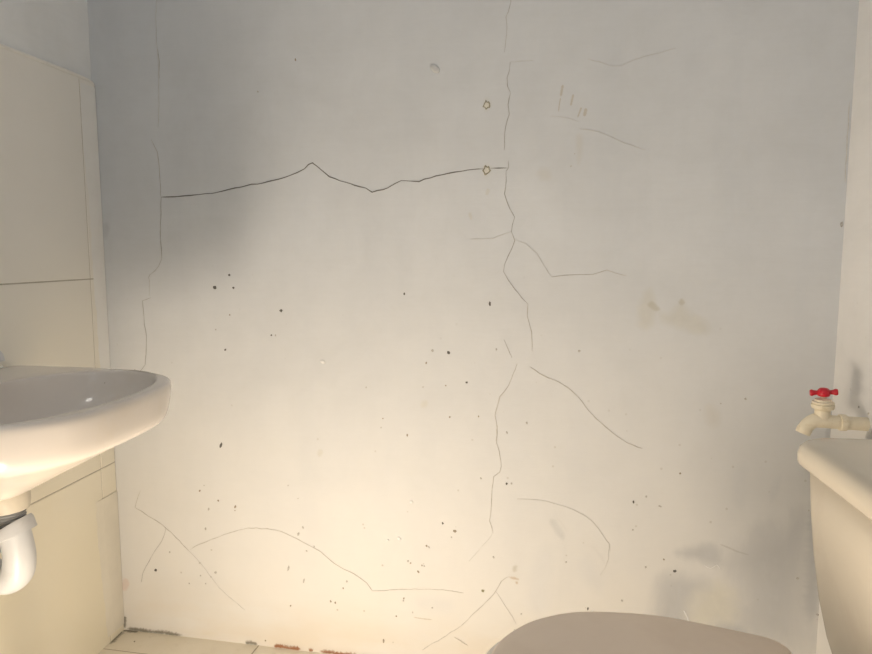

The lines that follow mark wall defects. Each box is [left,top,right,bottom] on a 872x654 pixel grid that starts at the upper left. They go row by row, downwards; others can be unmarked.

crack [140,0,625,371]
crack [470,340,643,560]
crack [135,492,462,609]
crack [423,577,512,650]
leakage [639,457,819,654]